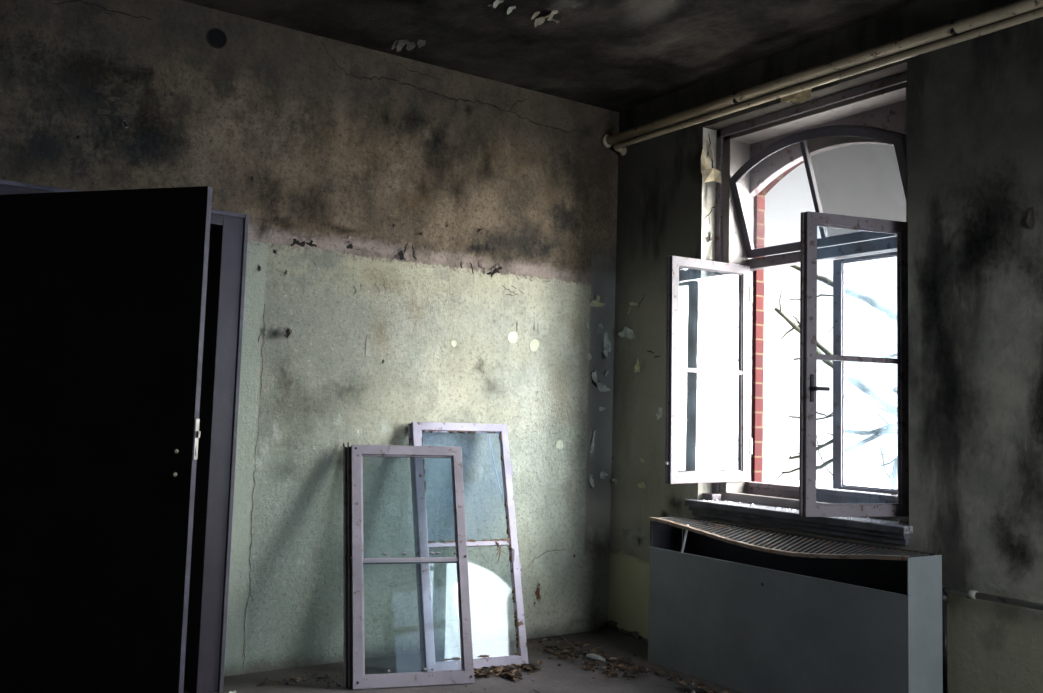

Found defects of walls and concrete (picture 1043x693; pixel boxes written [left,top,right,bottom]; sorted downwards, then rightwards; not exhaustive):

peeling [488,0,562,28]
damp [0,42,160,164]
damp [471,231,549,256]
crack [242,304,267,670]